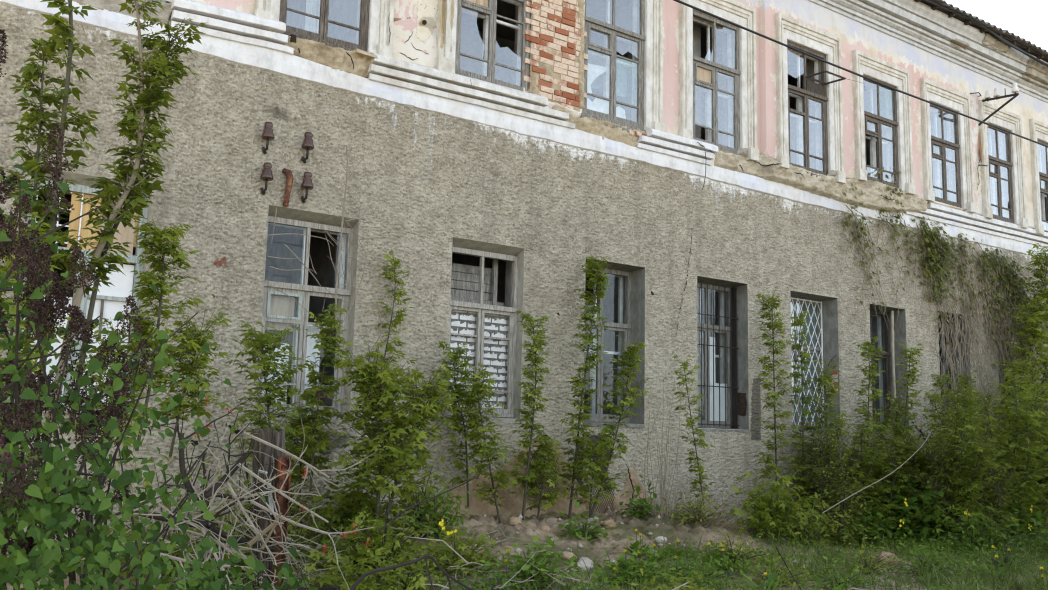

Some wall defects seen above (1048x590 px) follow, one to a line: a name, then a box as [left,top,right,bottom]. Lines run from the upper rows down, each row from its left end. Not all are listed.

flaking render [267,30,378,78]
crack [388,14,428,60]
peeling [416,0,438,44]
flaking render [520,0,647,150]
flaking render [714,147,928,213]